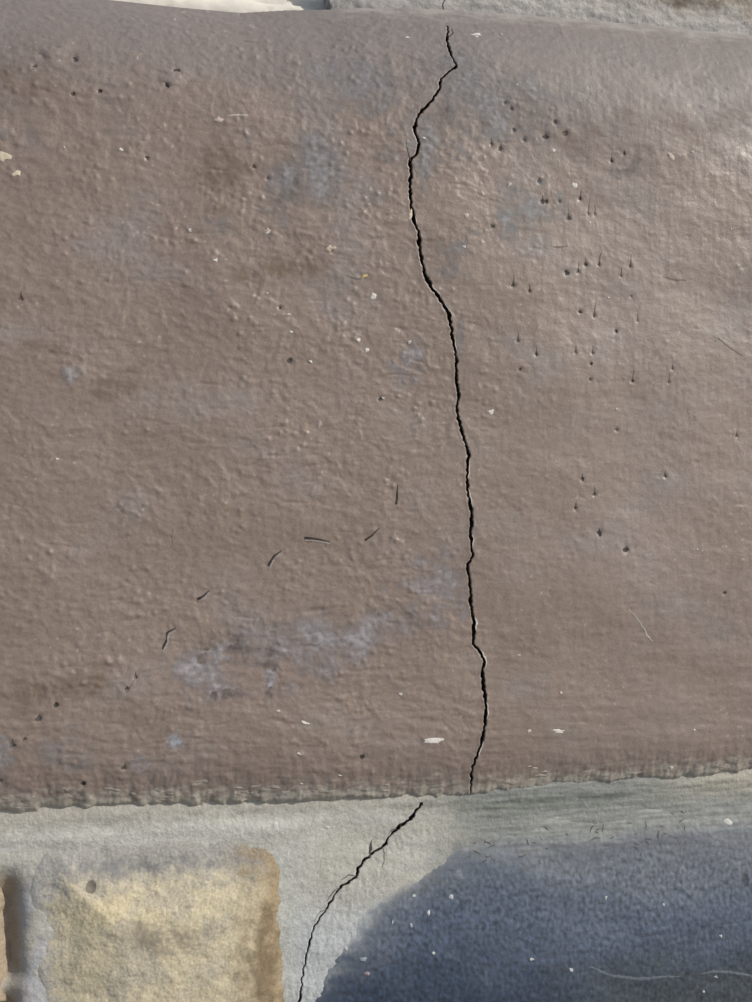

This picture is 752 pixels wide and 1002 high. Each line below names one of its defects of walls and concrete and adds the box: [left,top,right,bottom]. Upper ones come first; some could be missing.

crack [406,0,489,793]
crack [298,803,421,1002]